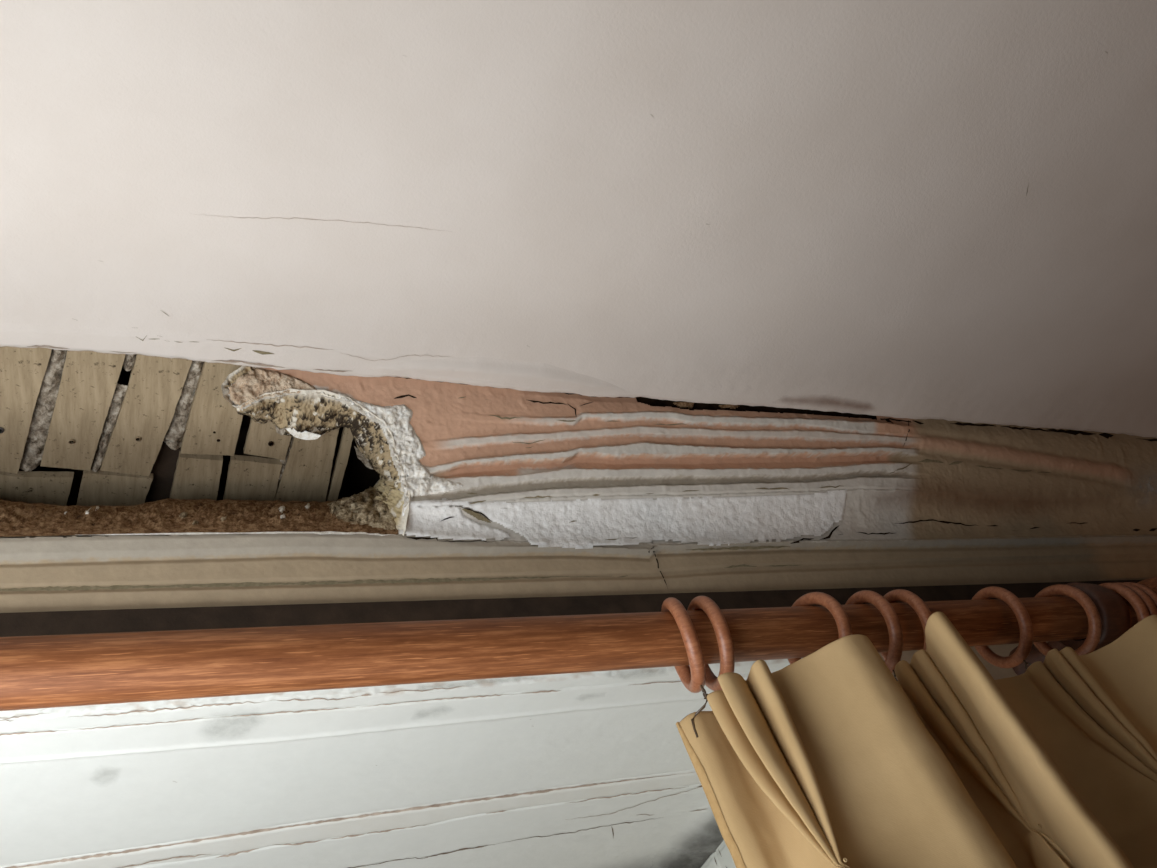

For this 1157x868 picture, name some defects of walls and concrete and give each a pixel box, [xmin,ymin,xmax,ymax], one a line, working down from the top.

flaking render [0,348,848,551]
crack [5,772,705,868]